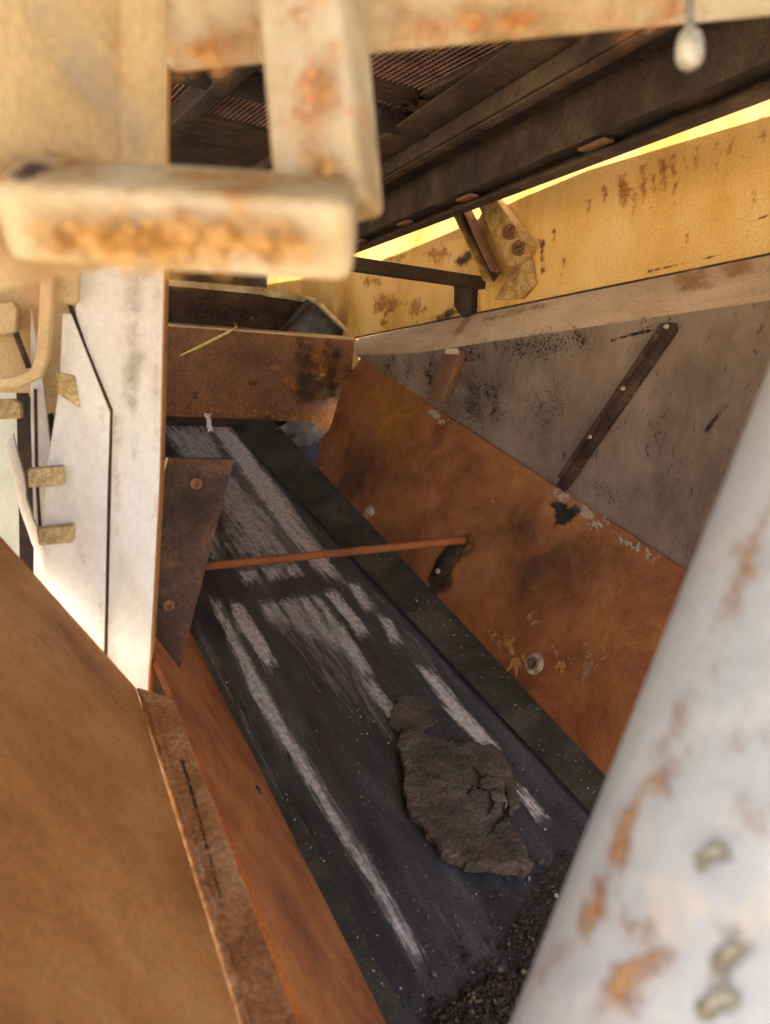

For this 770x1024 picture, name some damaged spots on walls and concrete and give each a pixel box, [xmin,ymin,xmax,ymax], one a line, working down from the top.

corrosion [602,155,677,207]
corrosion [34,207,314,276]
corrosion [363,278,397,326]
peeling [543,481,660,561]
peeling [488,628,528,675]
corrosion [610,802,636,864]
corrosion [696,843,728,871]
corrosion [579,878,604,935]
corrosion [607,953,657,1008]
corrosion [696,938,745,1021]